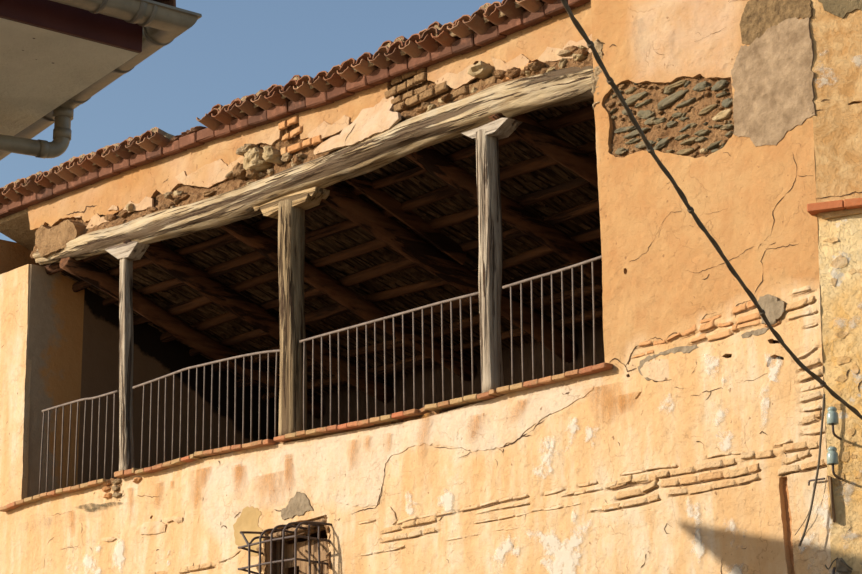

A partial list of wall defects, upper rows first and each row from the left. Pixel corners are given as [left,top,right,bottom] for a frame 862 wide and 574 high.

flaking render [384,34,592,121]
flaking render [604,76,734,158]
flaking render [74,115,351,229]
crack [689,143,811,317]
crack [609,332,677,372]
crack [495,414,551,468]
peeling [494,538,518,560]